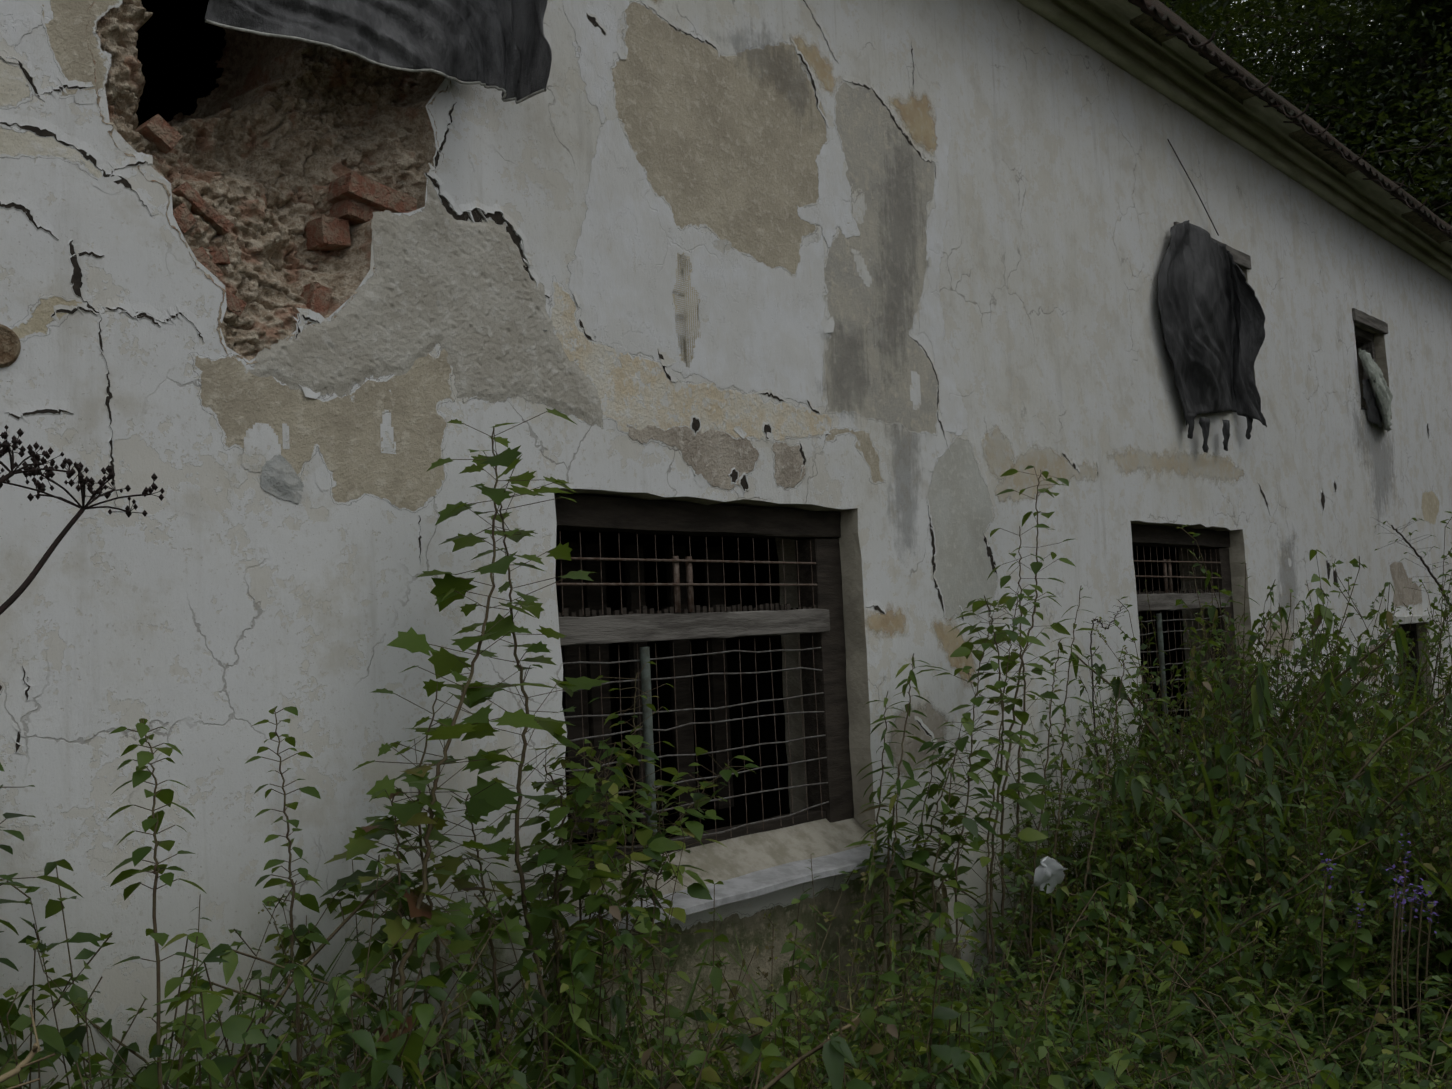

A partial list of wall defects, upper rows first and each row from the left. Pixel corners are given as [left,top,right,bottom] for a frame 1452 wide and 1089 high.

crack [0,48,159,216]
flaking render [8,294,86,341]
crack [0,192,211,507]
spalling [40,0,998,621]
flaking render [1388,561,1422,609]
crack [10,663,41,755]